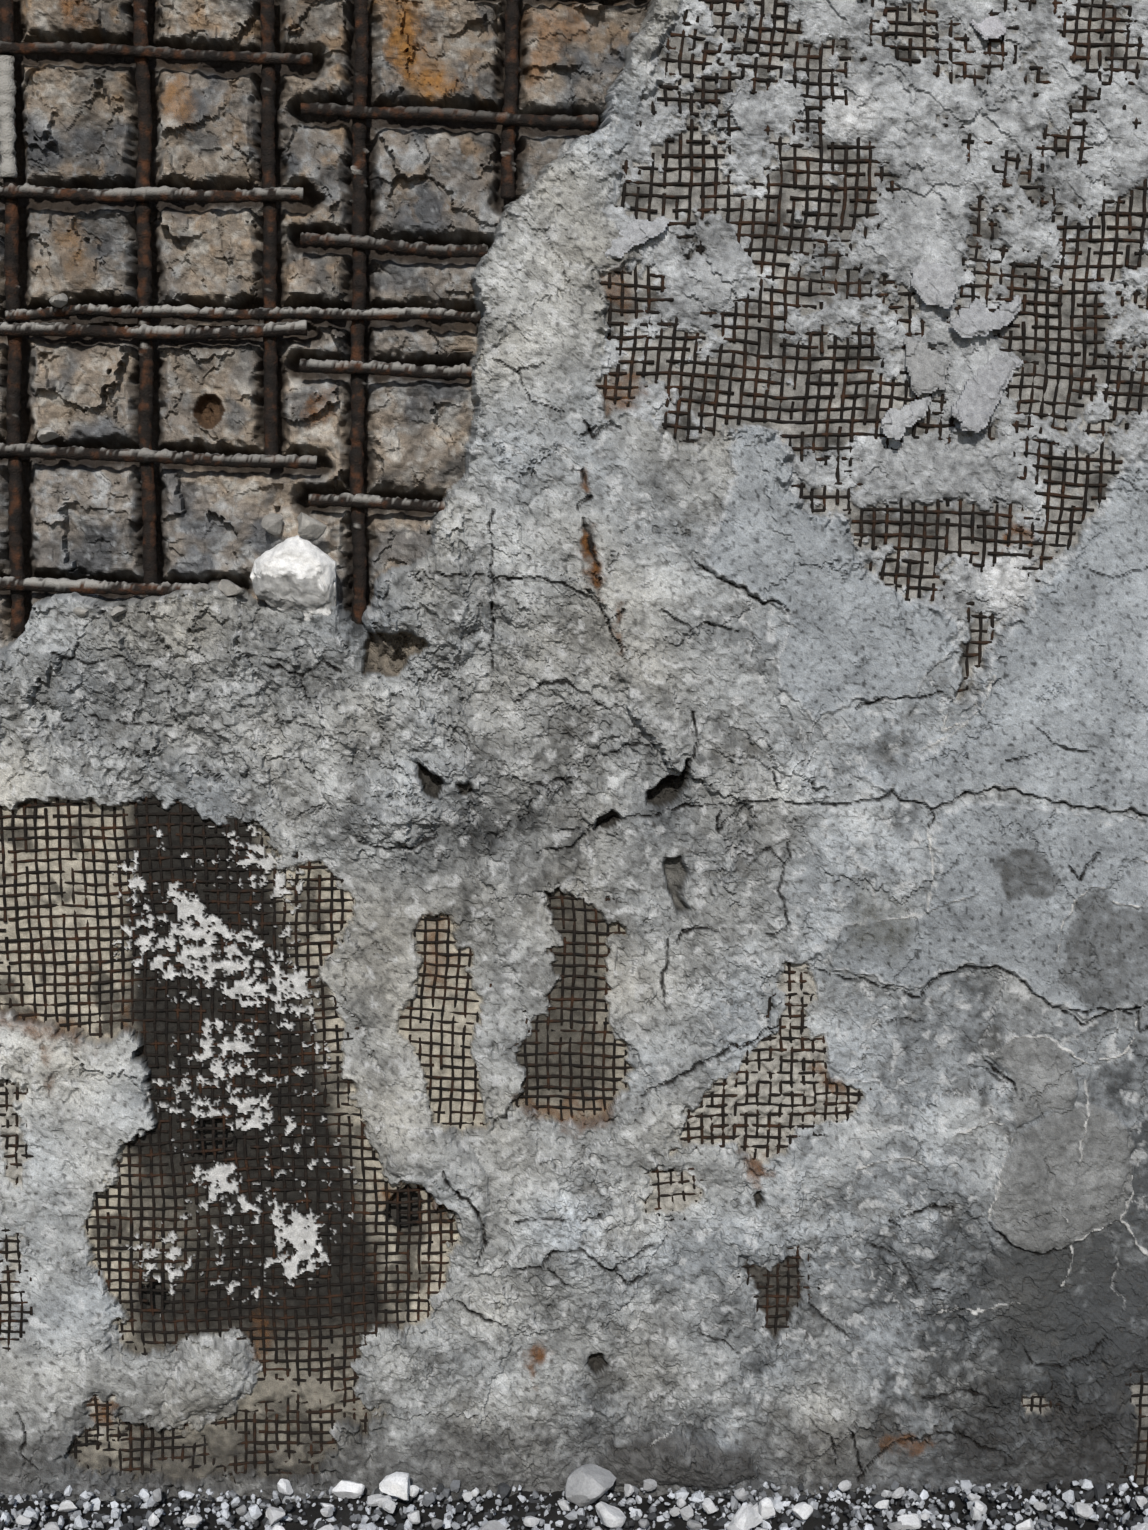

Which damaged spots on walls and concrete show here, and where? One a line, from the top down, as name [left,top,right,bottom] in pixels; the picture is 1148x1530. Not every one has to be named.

corrosion [389,8,450,101]
crack [429,361,625,669]
corrosion [581,529,601,587]
crack [663,565,781,632]
spalling [594,0,1148,1021]
crack [530,711,1145,936]
spalling [0,796,464,1487]
spalling [397,913,492,1134]
crack [445,1178,654,1285]
spalling [512,887,636,1127]
spalling [643,962,872,1221]
crack [807,966,1148,1032]